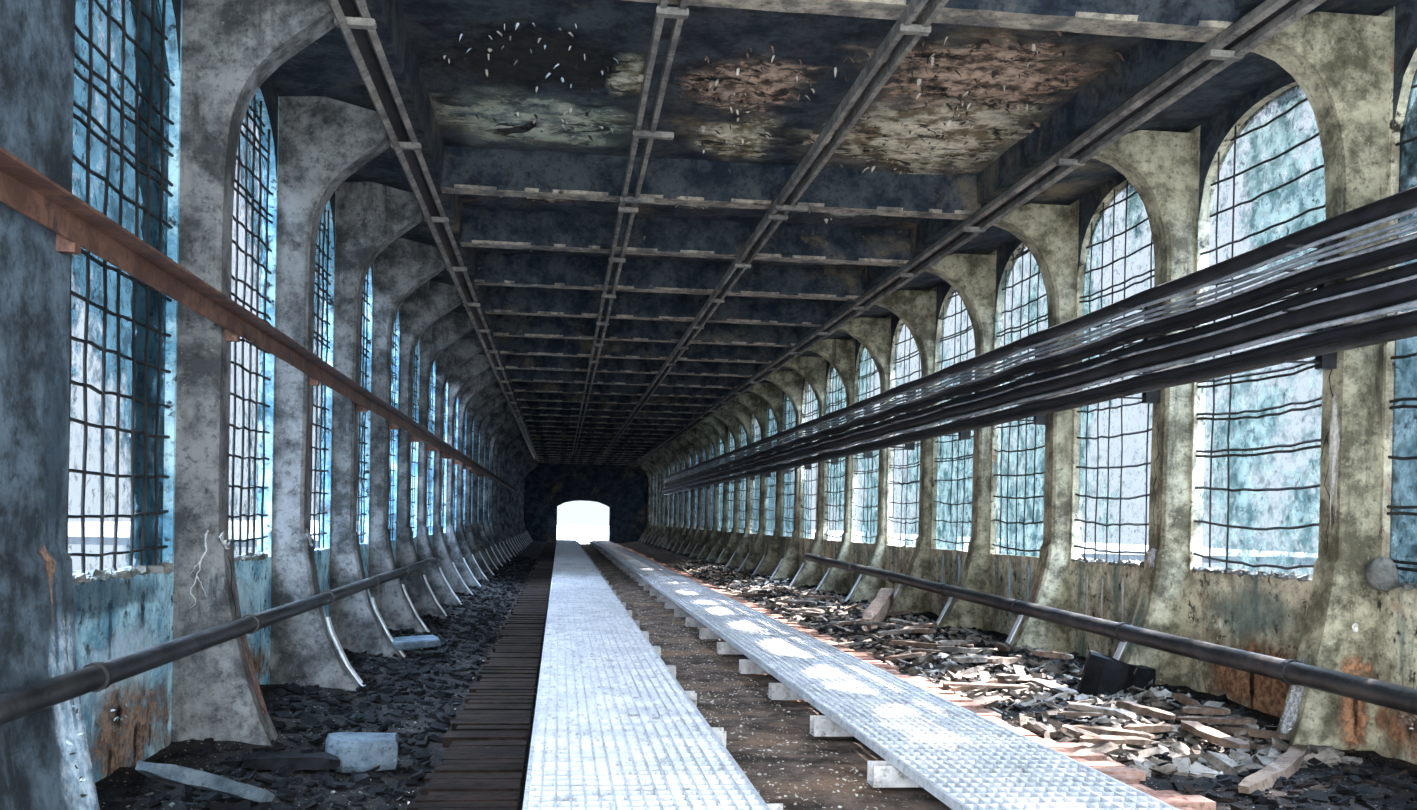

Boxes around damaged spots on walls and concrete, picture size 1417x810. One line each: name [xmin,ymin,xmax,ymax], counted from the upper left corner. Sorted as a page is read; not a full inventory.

damp [494,122,539,138]
peeling [680,29,1103,175]